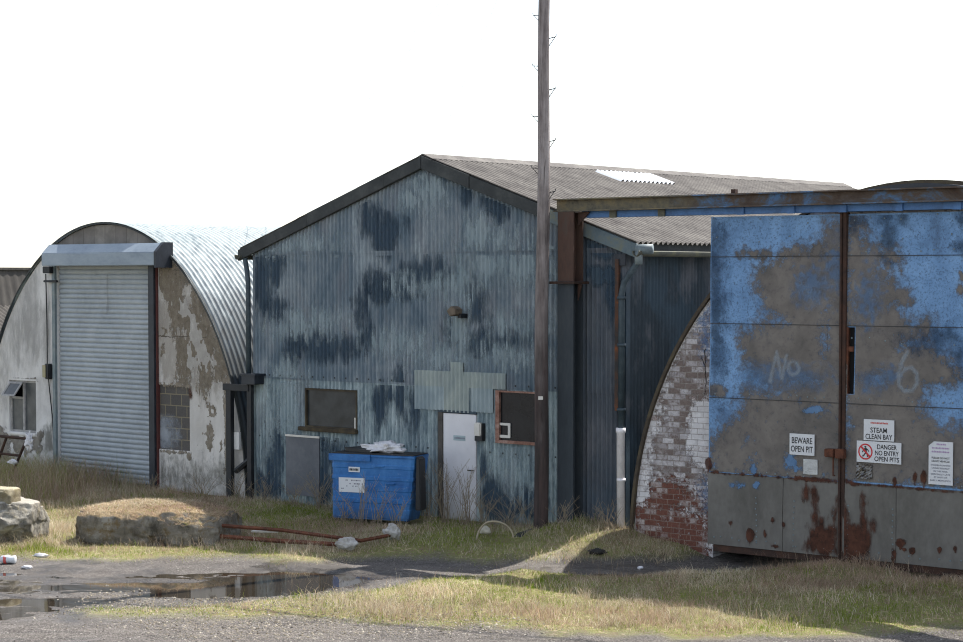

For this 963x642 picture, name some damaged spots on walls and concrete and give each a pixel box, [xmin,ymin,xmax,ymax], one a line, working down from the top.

leakage [390,173,449,218]
peeling [159,261,231,474]
leakage [263,356,311,457]
leakage [273,306,351,342]
leakage [372,212,536,373]
peeling [635,215,963,557]
corrosion [705,457,963,565]